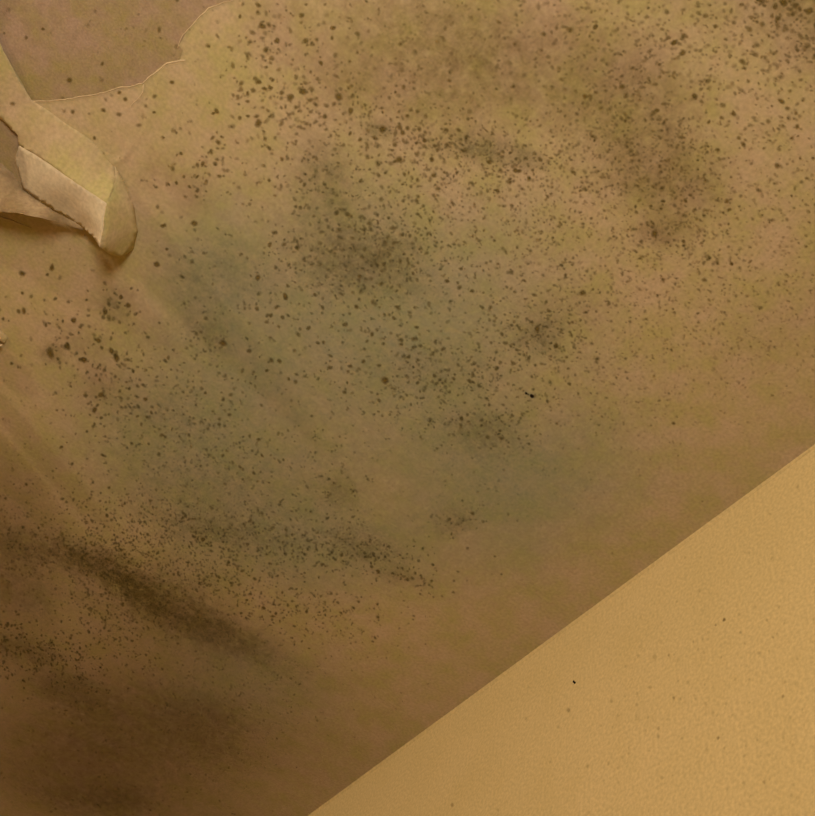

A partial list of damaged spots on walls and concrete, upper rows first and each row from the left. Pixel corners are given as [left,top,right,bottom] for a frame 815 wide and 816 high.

peeling [0,0,233,107]
peeling [0,119,32,196]